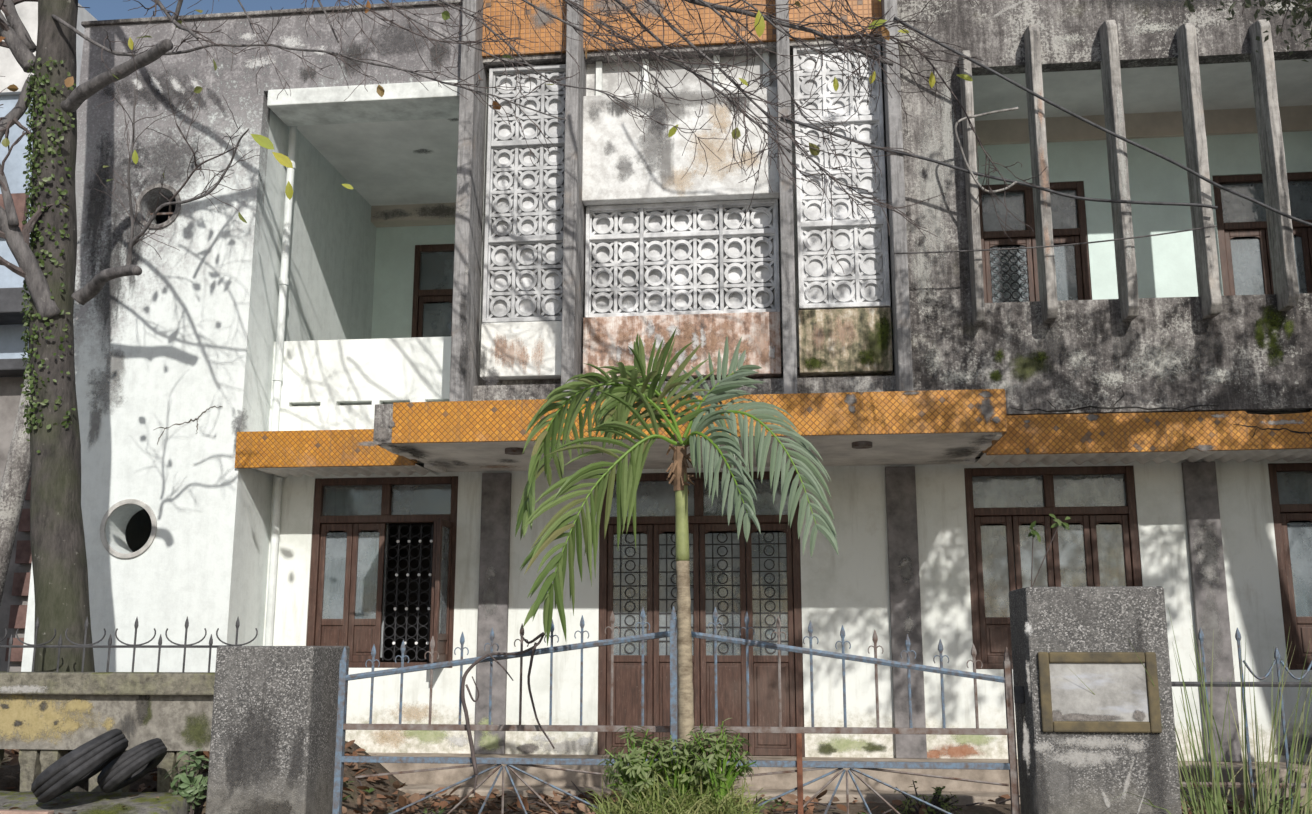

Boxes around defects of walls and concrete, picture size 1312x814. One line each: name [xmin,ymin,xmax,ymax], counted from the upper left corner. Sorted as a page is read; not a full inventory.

water stain [343,26,449,71]
water stain [103,72,225,113]
water stain [590,91,749,180]
water stain [84,140,199,335]
corrosion [495,339,542,364]
water stain [89,351,124,444]
crack [154,406,222,445]
peeling [940,391,1000,463]